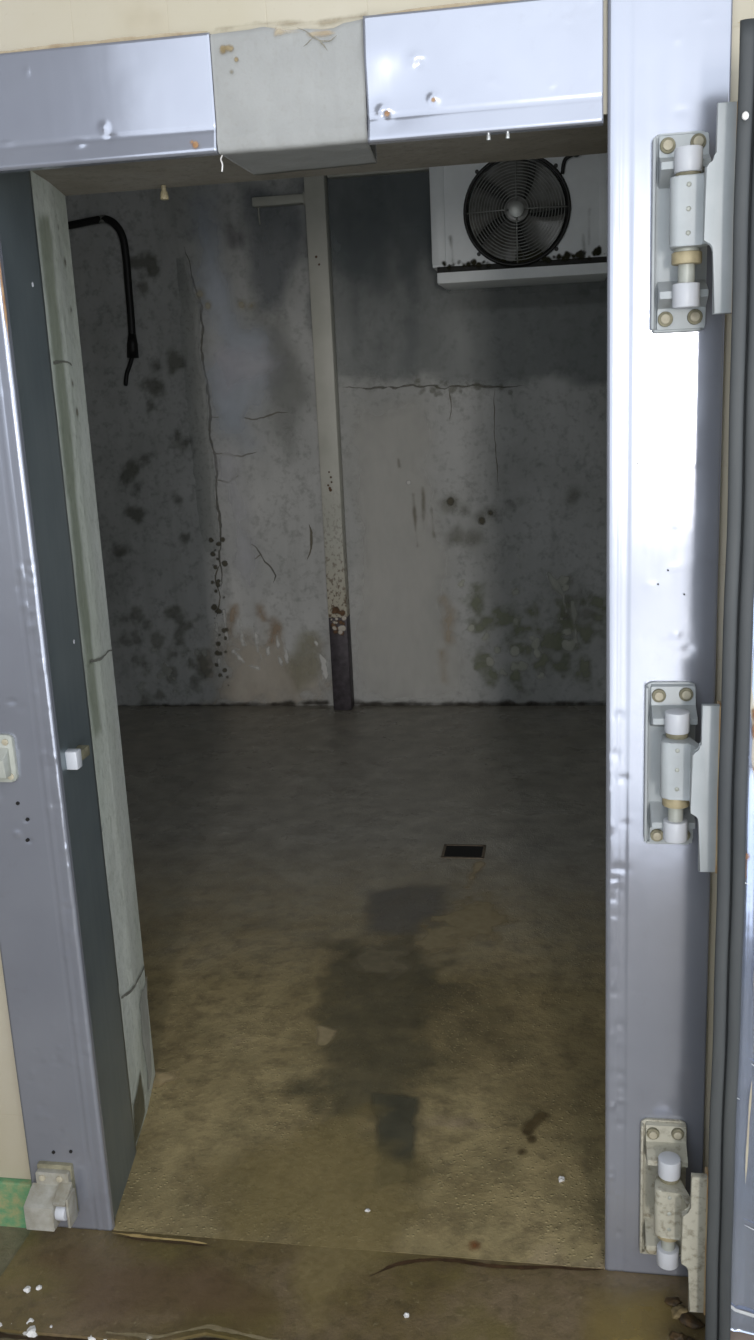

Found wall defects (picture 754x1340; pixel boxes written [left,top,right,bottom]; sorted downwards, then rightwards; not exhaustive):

crack [184,247,288,617]
crack [306,525,314,559]
corrosion [331,607,347,635]
crack [349,384,523,487]
leakage [354,413,606,706]
leakage [324,888,440,1187]